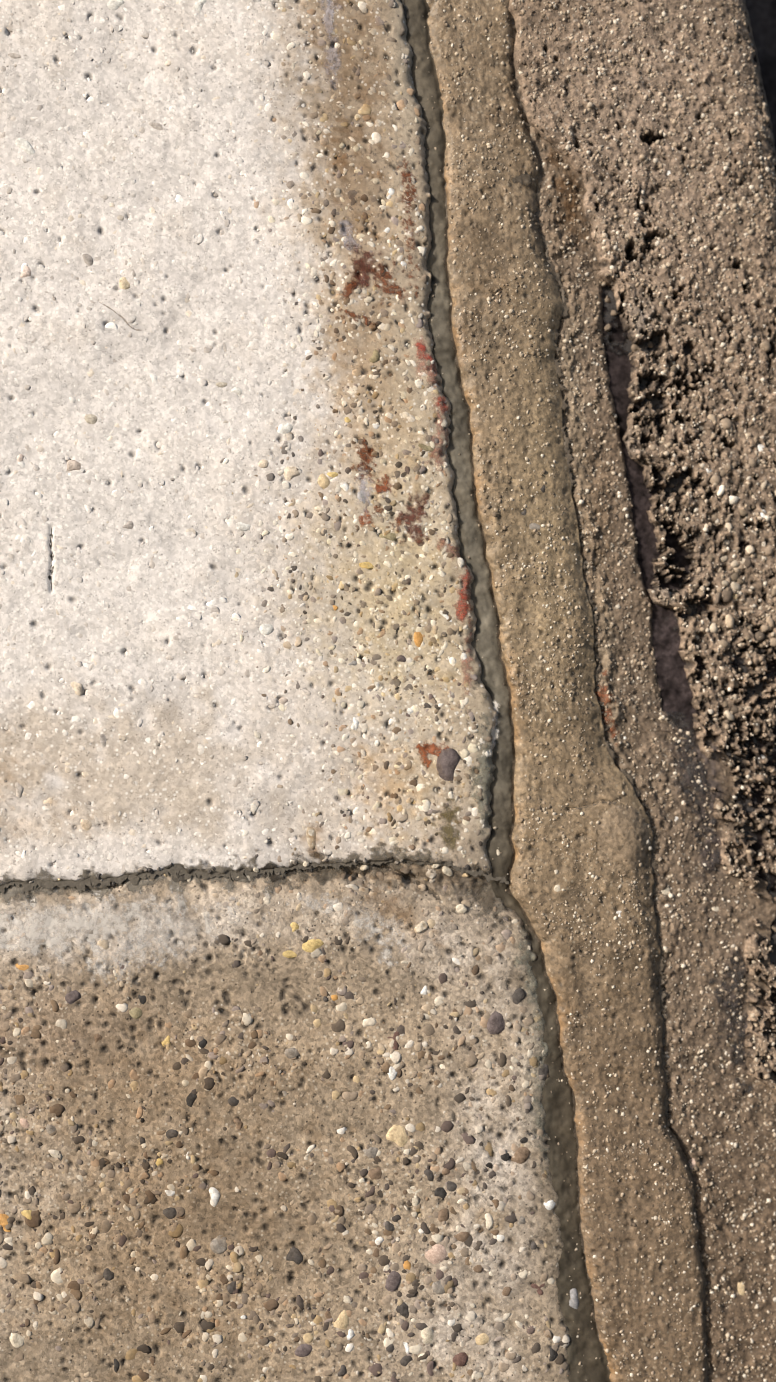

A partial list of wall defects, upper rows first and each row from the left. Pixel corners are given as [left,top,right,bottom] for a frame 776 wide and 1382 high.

spalling [601,285,667,359]
spalling [639,376,667,434]
corrosion [351,439,428,544]
spalling [653,472,698,502]
spalling [662,582,711,630]
crack [0,114,609,1370]
corrosion [416,742,449,768]
crack [510,15,710,1382]
spalling [724,628,776,841]
spalling [756,873,776,965]